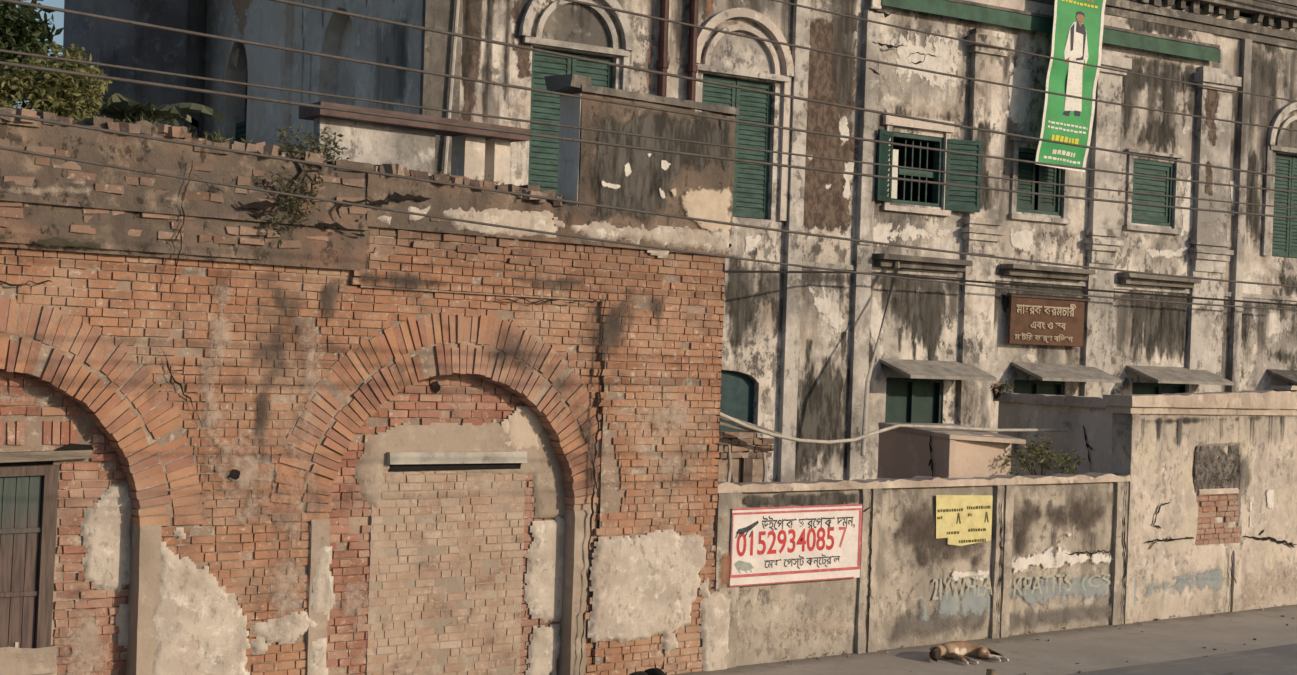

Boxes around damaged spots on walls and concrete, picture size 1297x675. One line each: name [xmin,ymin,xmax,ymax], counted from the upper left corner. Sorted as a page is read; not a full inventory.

crack [169,165,279,299]
crack [318,192,431,237]
flaking render [0,146,761,267]
leakage [425,0,531,118]
leakage [724,247,783,349]
leakage [870,276,962,361]
leakage [1122,56,1197,152]
leakage [1215,36,1297,243]
flaking render [80,483,133,648]
flaking render [151,527,335,675]
flaking render [524,516,565,675]
flaking render [587,529,731,671]